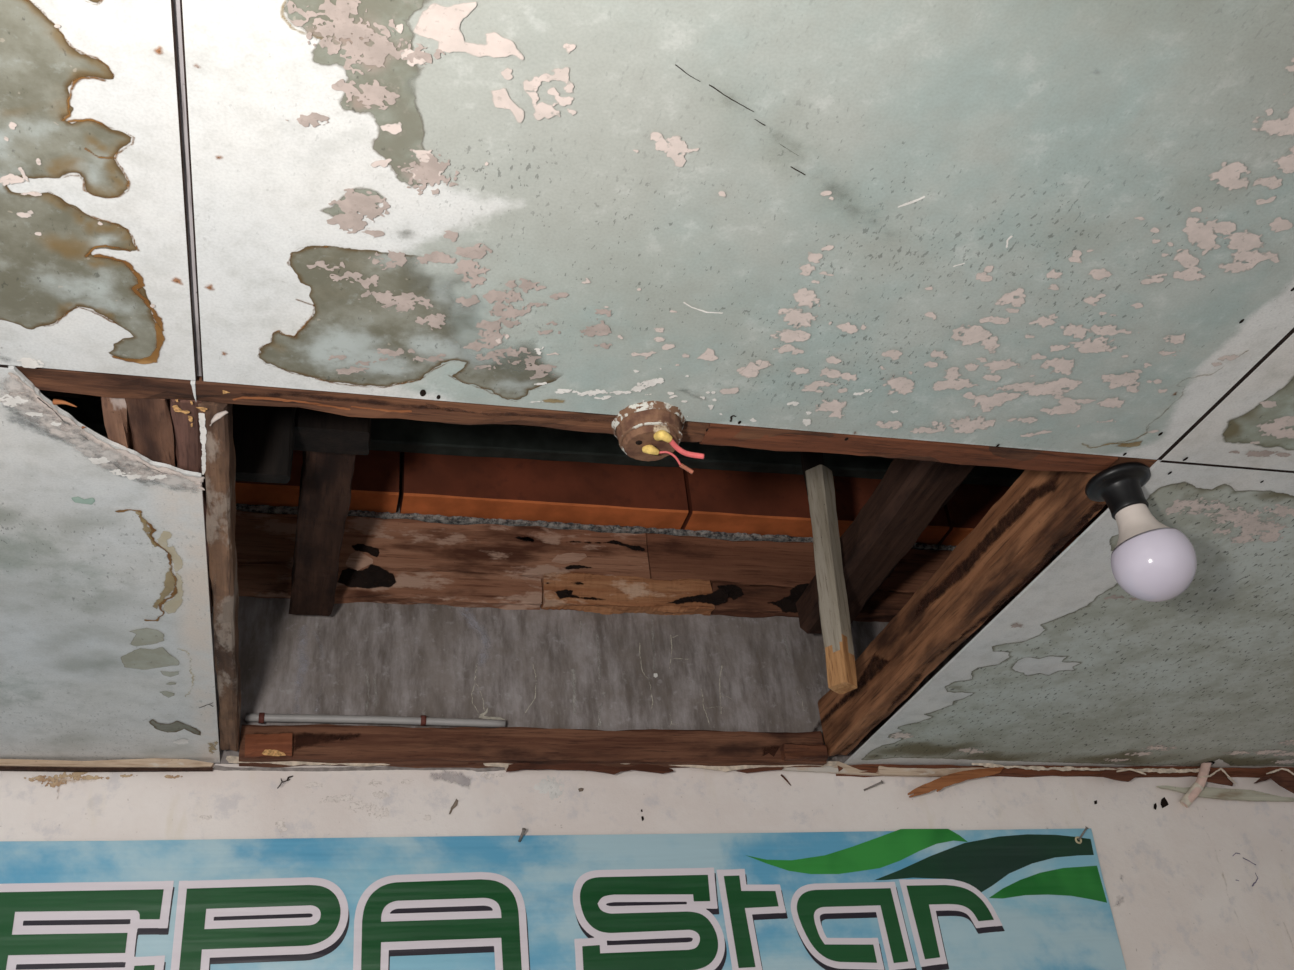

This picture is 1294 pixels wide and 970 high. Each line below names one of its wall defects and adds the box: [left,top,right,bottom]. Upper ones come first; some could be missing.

peeling [285,0,577,134]
water stain [0,0,165,364]
peeling [371,149,459,195]
peeling [633,132,699,167]
peeling [1208,94,1294,205]
peeling [1134,207,1293,285]
peeling [307,188,1186,437]
spalling [0,357,205,490]
peeling [1229,400,1294,457]
peeling [1161,497,1294,544]
water stain [121,628,194,697]
water stain [149,719,201,735]